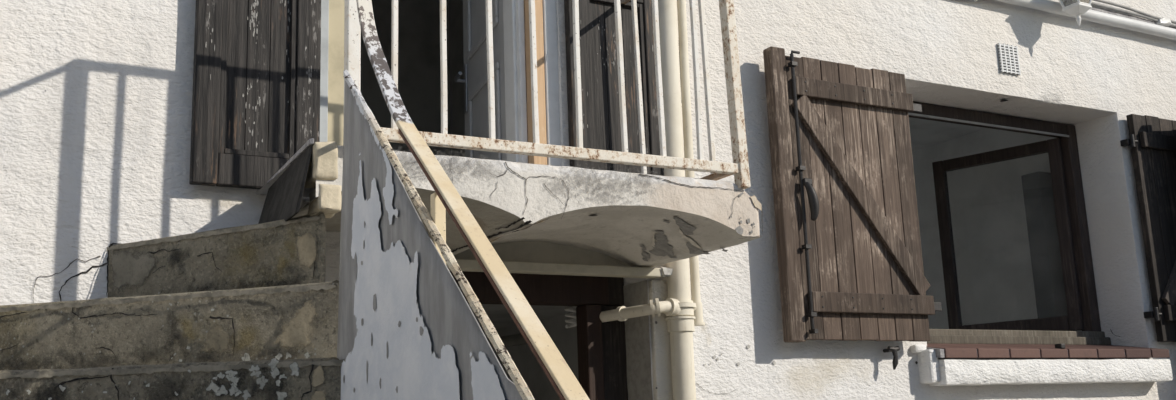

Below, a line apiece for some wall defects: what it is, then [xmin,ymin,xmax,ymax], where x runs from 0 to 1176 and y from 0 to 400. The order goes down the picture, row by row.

peeling [247,0,259,43]
crack [451,162,569,252]
crack [639,174,763,239]
spalling [730,192,762,235]
crack [0,243,158,319]
crack [148,249,221,274]
flaking render [296,232,317,268]
peeling [341,89,505,400]
peeling [640,217,728,262]
crack [54,347,119,400]
spalling [310,366,326,400]